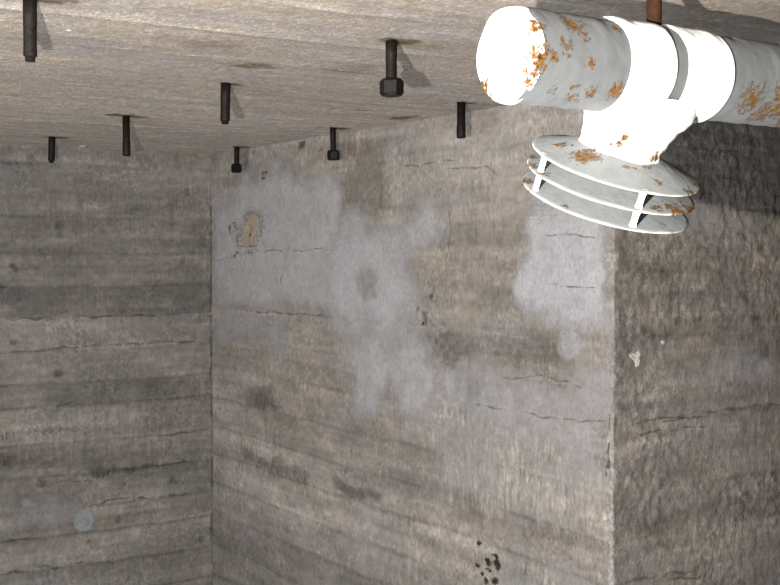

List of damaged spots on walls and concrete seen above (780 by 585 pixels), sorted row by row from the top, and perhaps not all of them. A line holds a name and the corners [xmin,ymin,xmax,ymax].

damp [214,124,611,535]